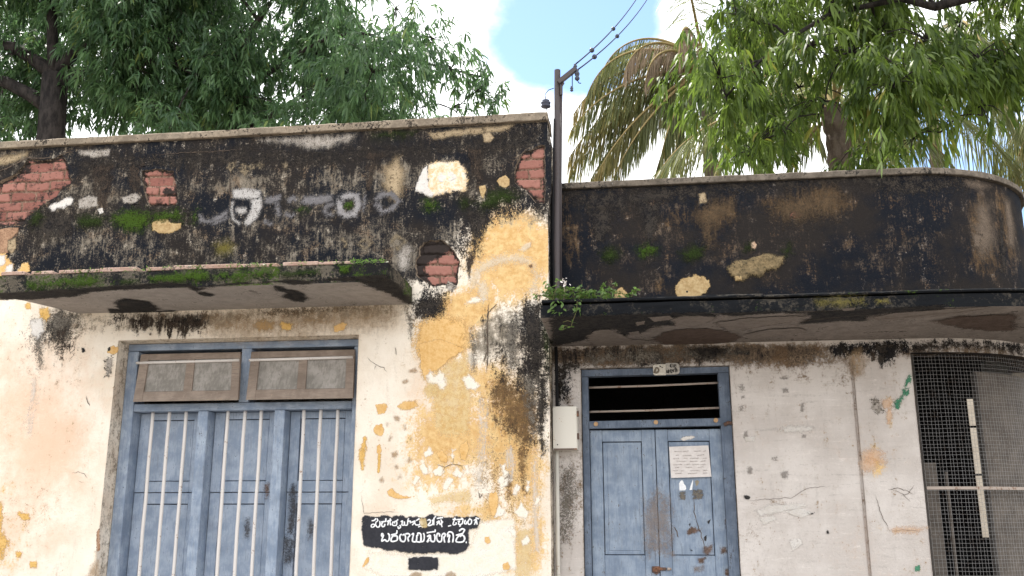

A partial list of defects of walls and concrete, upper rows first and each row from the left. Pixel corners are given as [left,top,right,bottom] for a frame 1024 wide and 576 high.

flaking render [0,148,111,276]
flaking render [121,165,182,234]
flaking render [255,132,359,153]
flaking render [381,141,552,208]
flaking render [358,236,541,305]
flaking render [675,274,711,296]
damp [0,274,390,432]
peeling [403,309,470,389]
damp [841,339,1023,375]
peeling [359,399,471,505]
damp [467,294,754,551]
peeling [488,464,542,576]